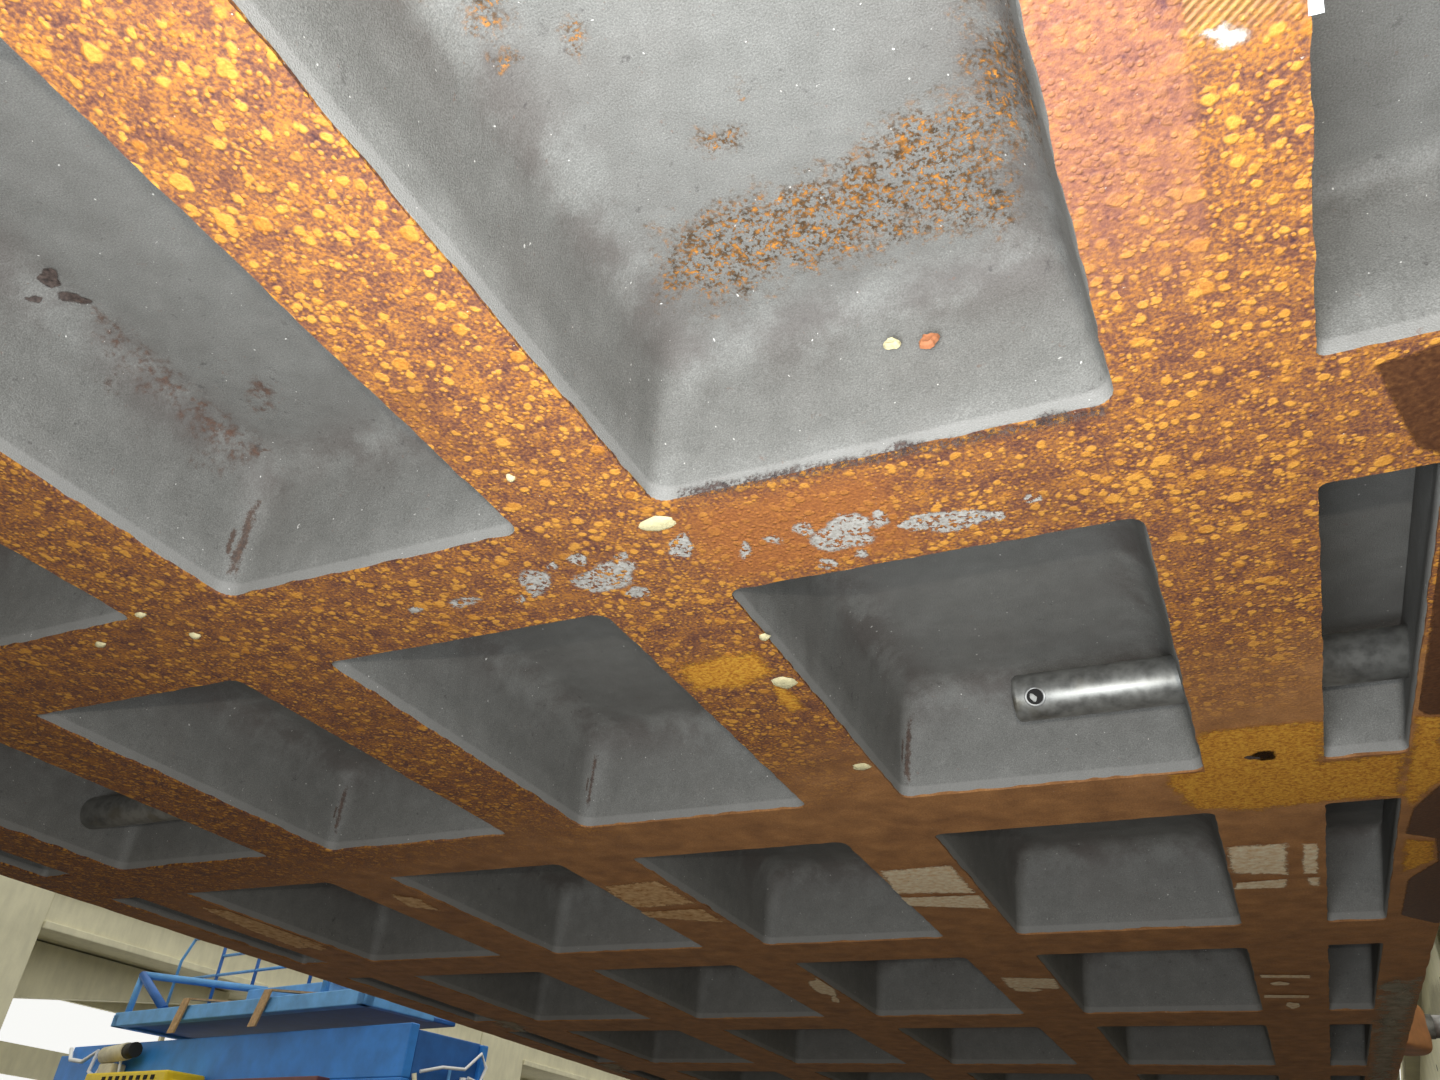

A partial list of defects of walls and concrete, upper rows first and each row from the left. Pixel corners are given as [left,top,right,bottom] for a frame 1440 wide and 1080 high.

corrosion [467,0,501,32]
corrosion [567,21,582,54]
corrosion [650,0,1041,304]
peeling [669,533,692,557]
peeling [740,509,1006,569]
peeling [517,552,650,602]
corrosion [1167,717,1440,811]
corrosion [1401,840,1435,871]
peeling [1234,879,1287,889]